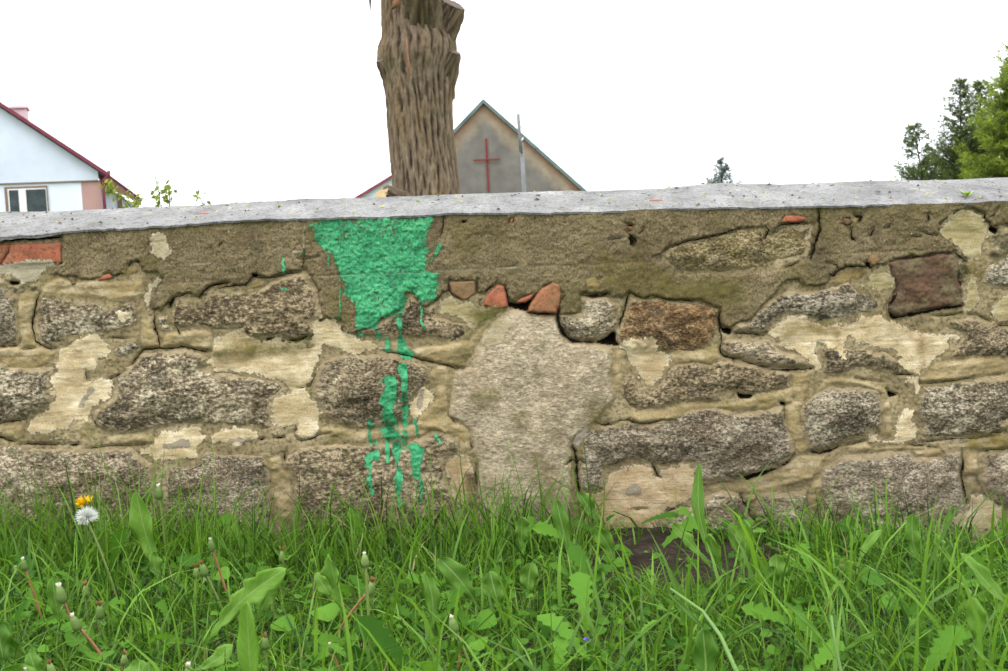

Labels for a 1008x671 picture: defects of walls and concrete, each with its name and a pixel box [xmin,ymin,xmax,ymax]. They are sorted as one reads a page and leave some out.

crack [670,227,742,247]
crack [765,210,865,277]
crack [851,215,891,240]
crack [890,215,967,262]
peeling [0,259,57,285]
crack [85,252,315,381]